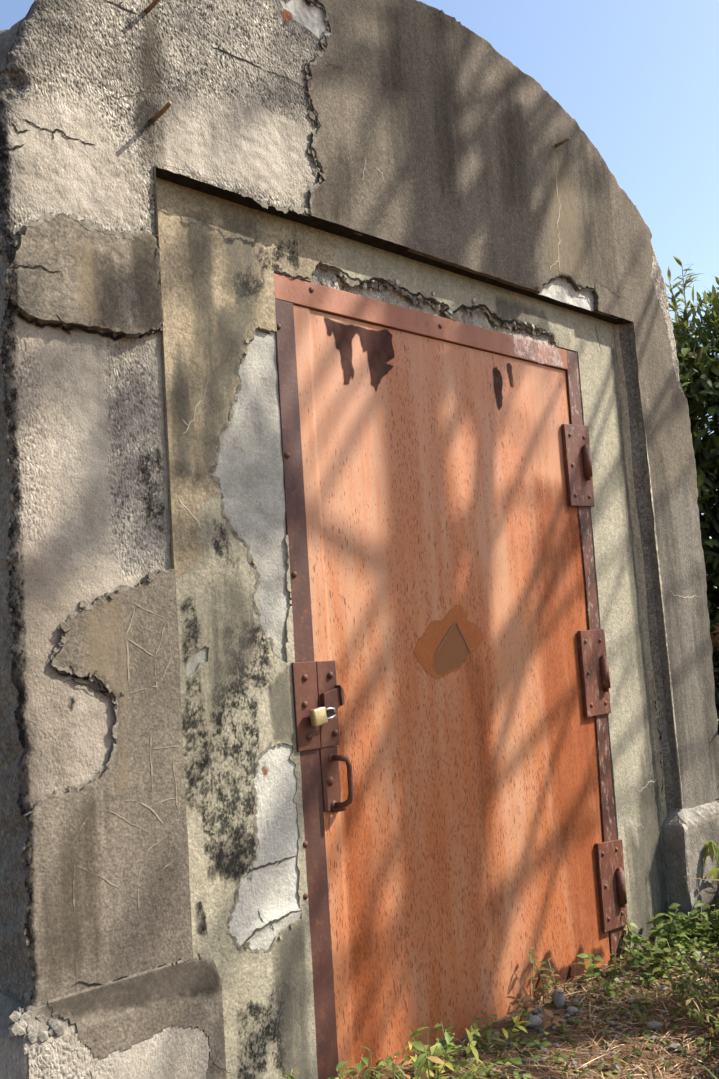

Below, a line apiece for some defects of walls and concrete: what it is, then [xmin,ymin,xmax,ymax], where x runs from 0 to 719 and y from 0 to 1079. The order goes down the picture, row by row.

crack [0,119,95,154]
spalling [0,0,332,264]
crack [3,261,157,341]
spalling [536,277,594,312]
corrosion [324,317,394,391]
corrosion [493,363,513,410]
flaking render [207,329,290,661]
spalling [0,298,172,815]
crack [55,670,117,705]
leakage [182,586,293,883]
flaking render [226,741,301,953]
crack [241,910,302,946]